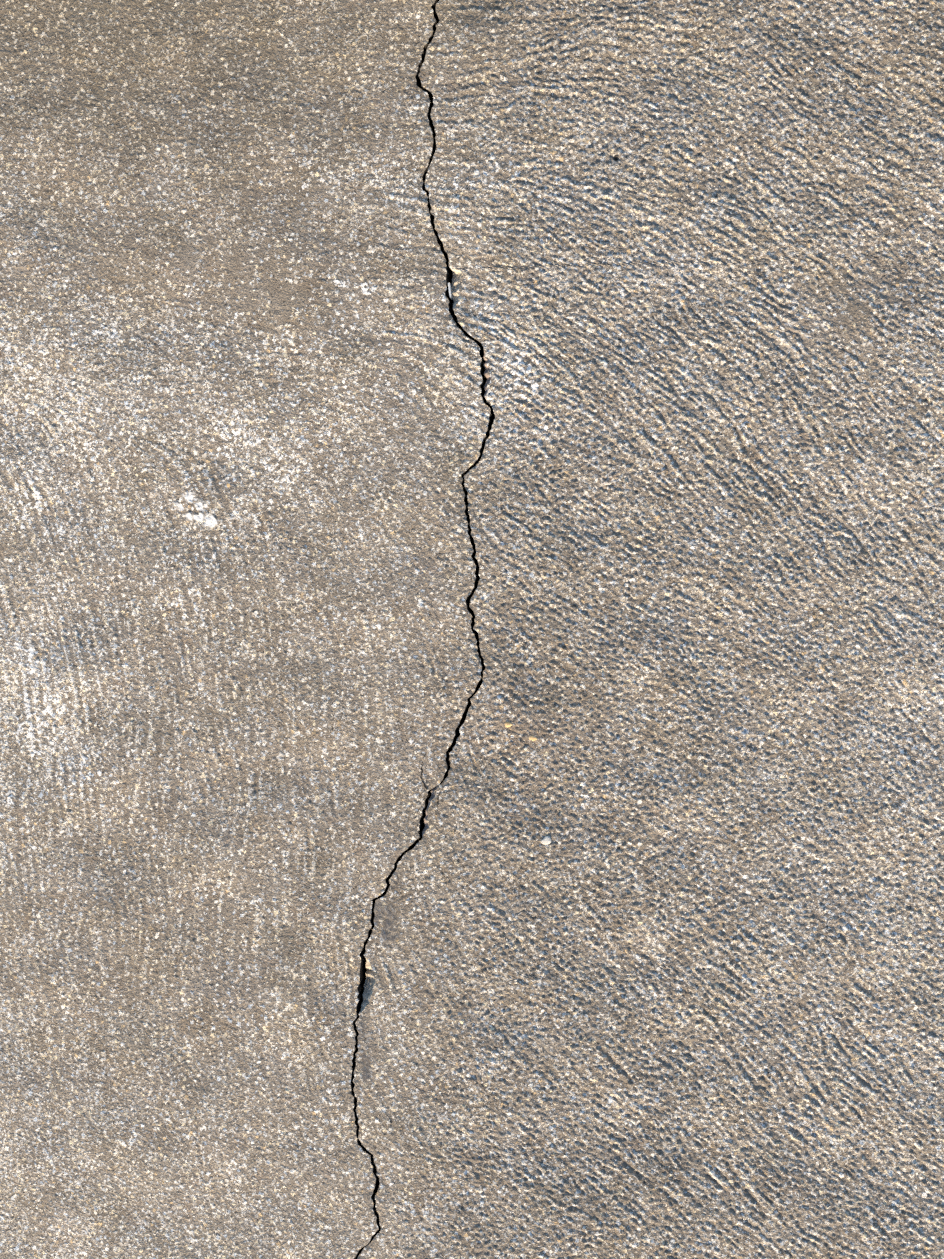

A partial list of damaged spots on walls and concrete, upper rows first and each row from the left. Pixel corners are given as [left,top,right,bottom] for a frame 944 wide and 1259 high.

crack [350,0,495,1259]